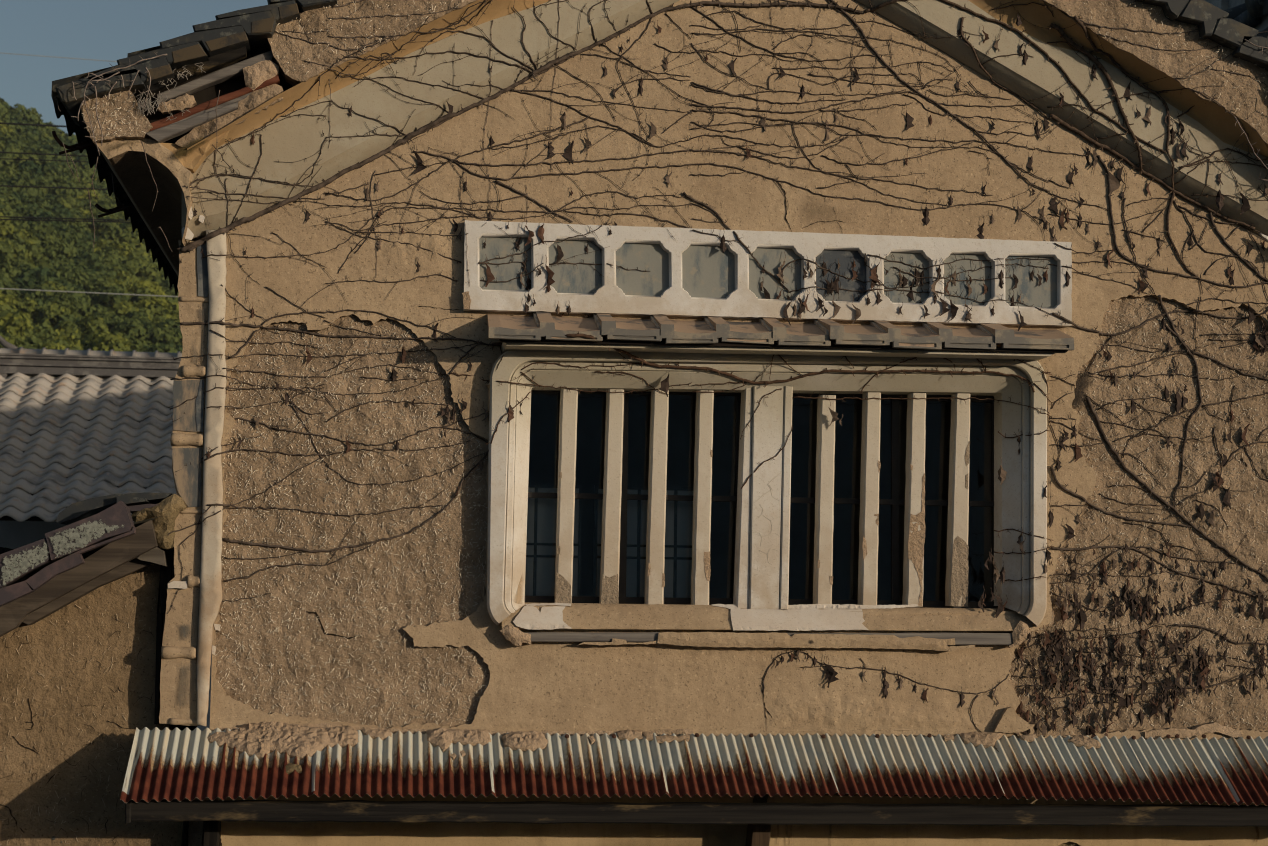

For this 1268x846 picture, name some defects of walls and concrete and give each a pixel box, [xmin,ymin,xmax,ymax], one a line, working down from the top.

flaking render [513,572,572,630]
flaking render [601,574,619,604]
flaking render [712,464,925,631]
flaking render [950,536,969,607]
crack [0,661,153,843]
corrosion [120,728,1268,806]